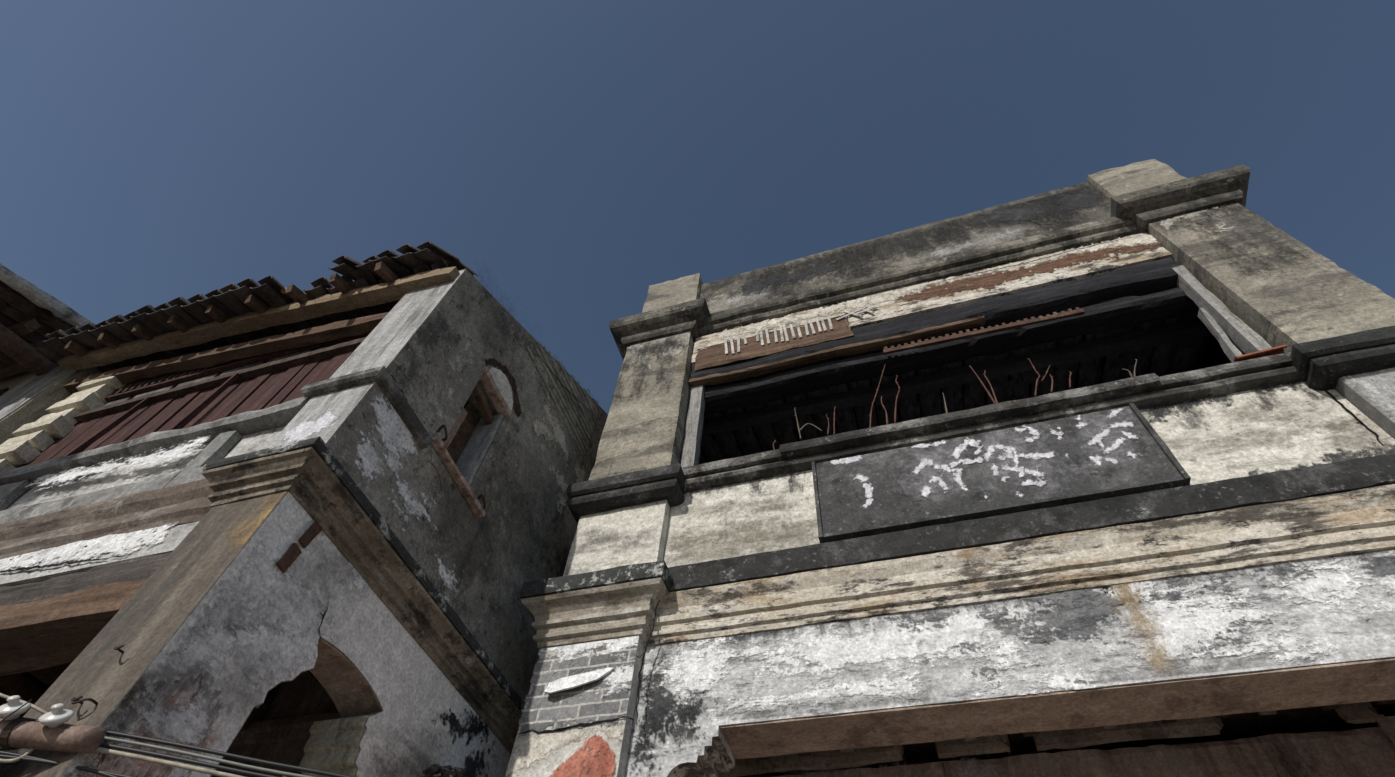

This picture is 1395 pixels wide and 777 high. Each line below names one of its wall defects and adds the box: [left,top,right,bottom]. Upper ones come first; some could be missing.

peeling [354,394,438,531]
peeling [77,541,339,777]
peeling [340,562,369,601]
peeling [435,555,458,606]
leakage [433,709,498,777]
flaking render [506,636,639,777]
leakage [628,645,718,775]
peeling [653,551,1395,720]